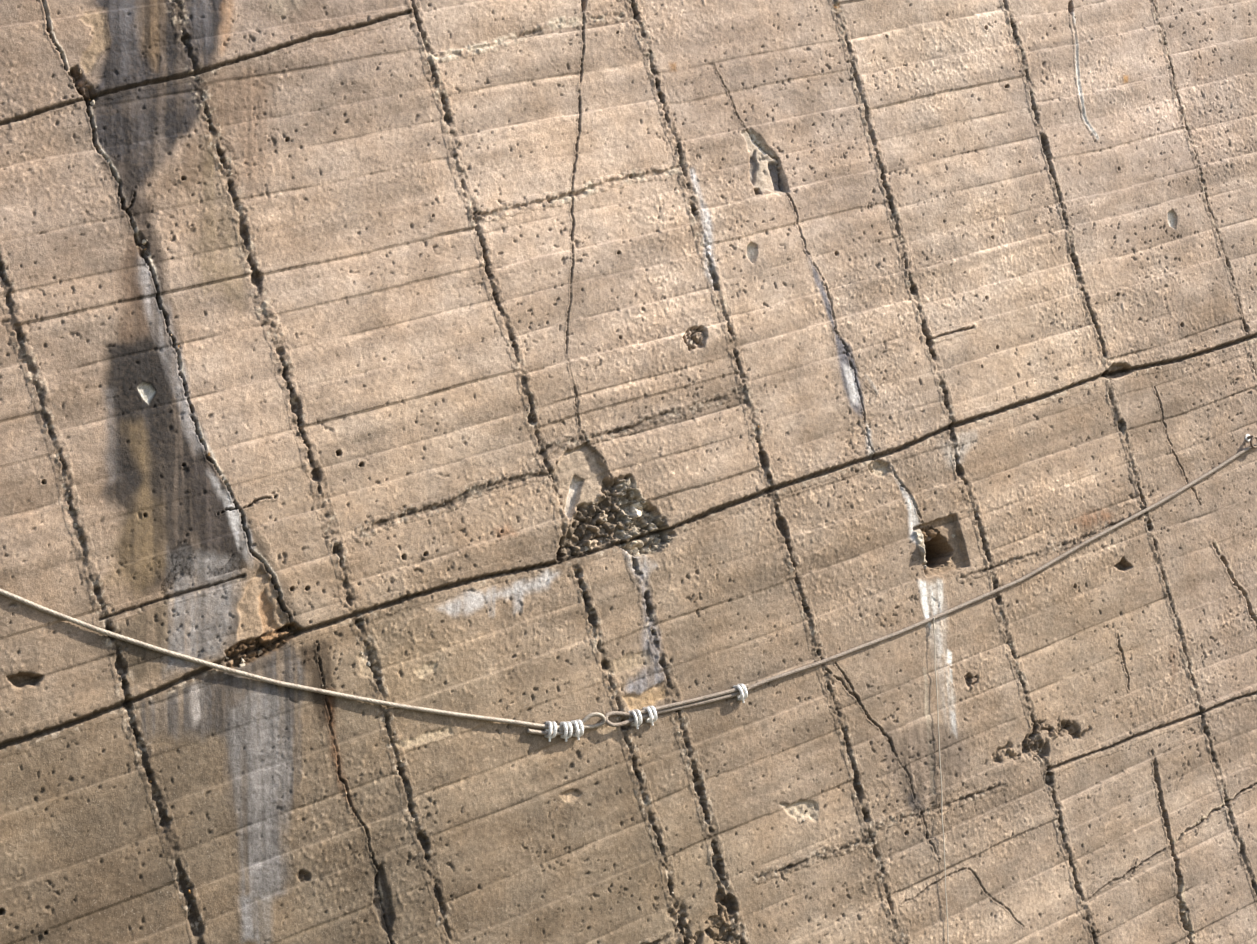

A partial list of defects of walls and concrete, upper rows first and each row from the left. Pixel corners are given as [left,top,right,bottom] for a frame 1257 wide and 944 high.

damp [82,0,308,687]
crack [0,0,398,944]
damp [139,636,339,944]
crack [164,0,1026,944]
spalling [556,445,676,557]
damp [866,576,978,828]
crack [828,0,1257,944]